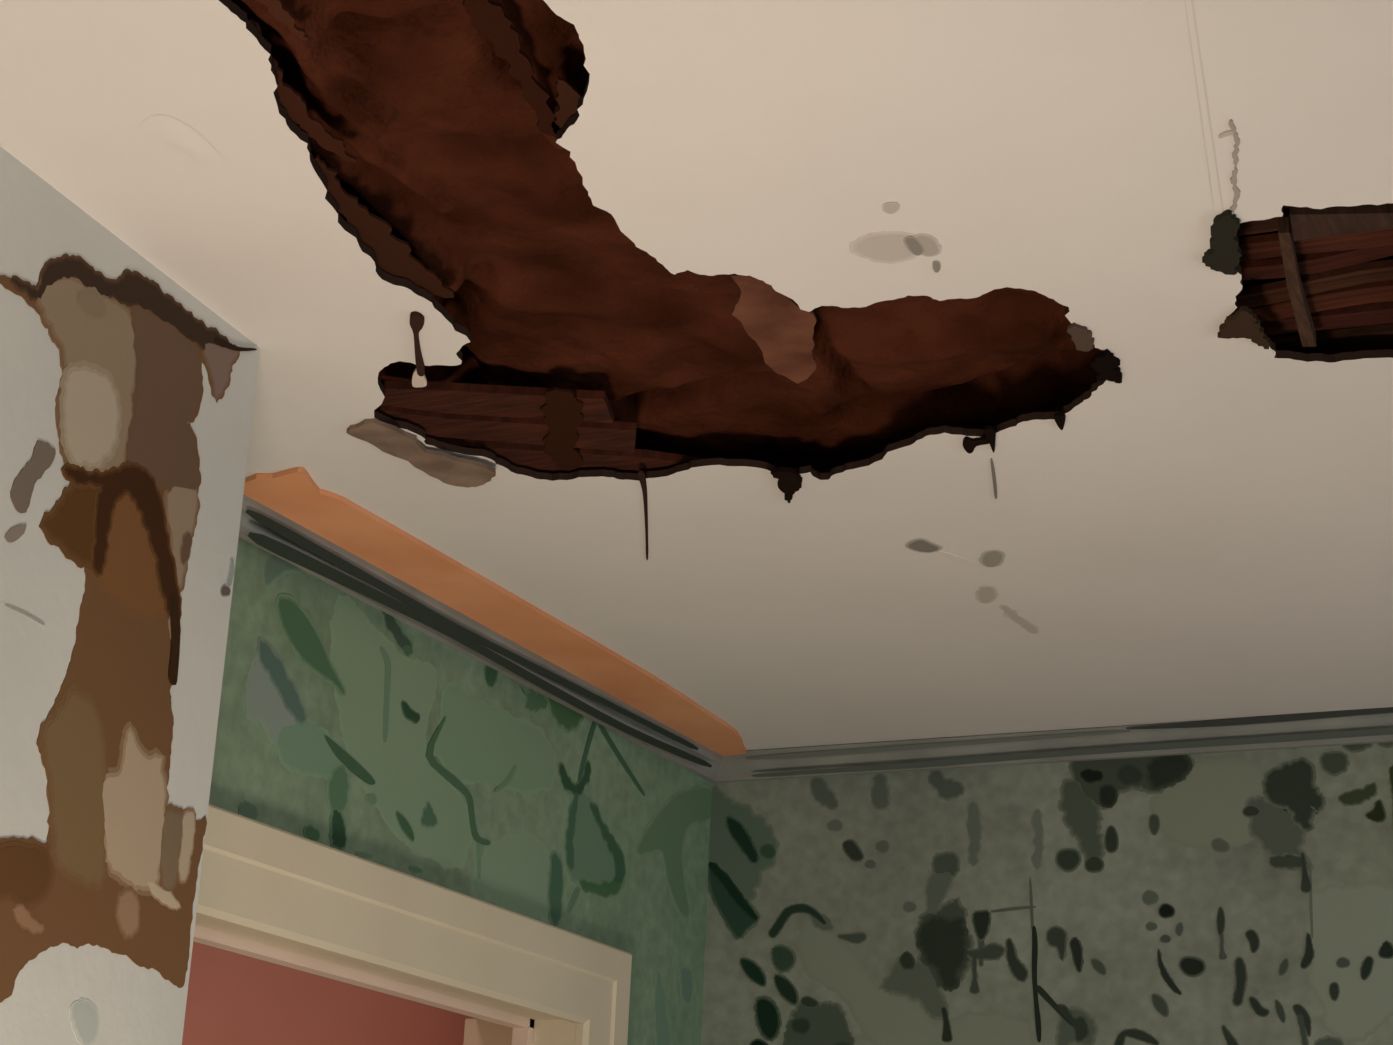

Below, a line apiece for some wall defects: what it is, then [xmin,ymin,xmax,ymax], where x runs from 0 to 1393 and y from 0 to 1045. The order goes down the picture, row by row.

peeling [0,253,240,592]
peeling [412,369,427,387]
peeling [0,495,207,1003]
mould [709,784,780,902]
damp [810,777,843,832]
damp [809,909,867,944]
mould [879,770,984,1021]
mould [1030,754,1195,870]
damp [1145,922,1183,943]
damp [1245,742,1393,874]
mould [750,996,855,1045]
damp [1055,1006,1099,1045]